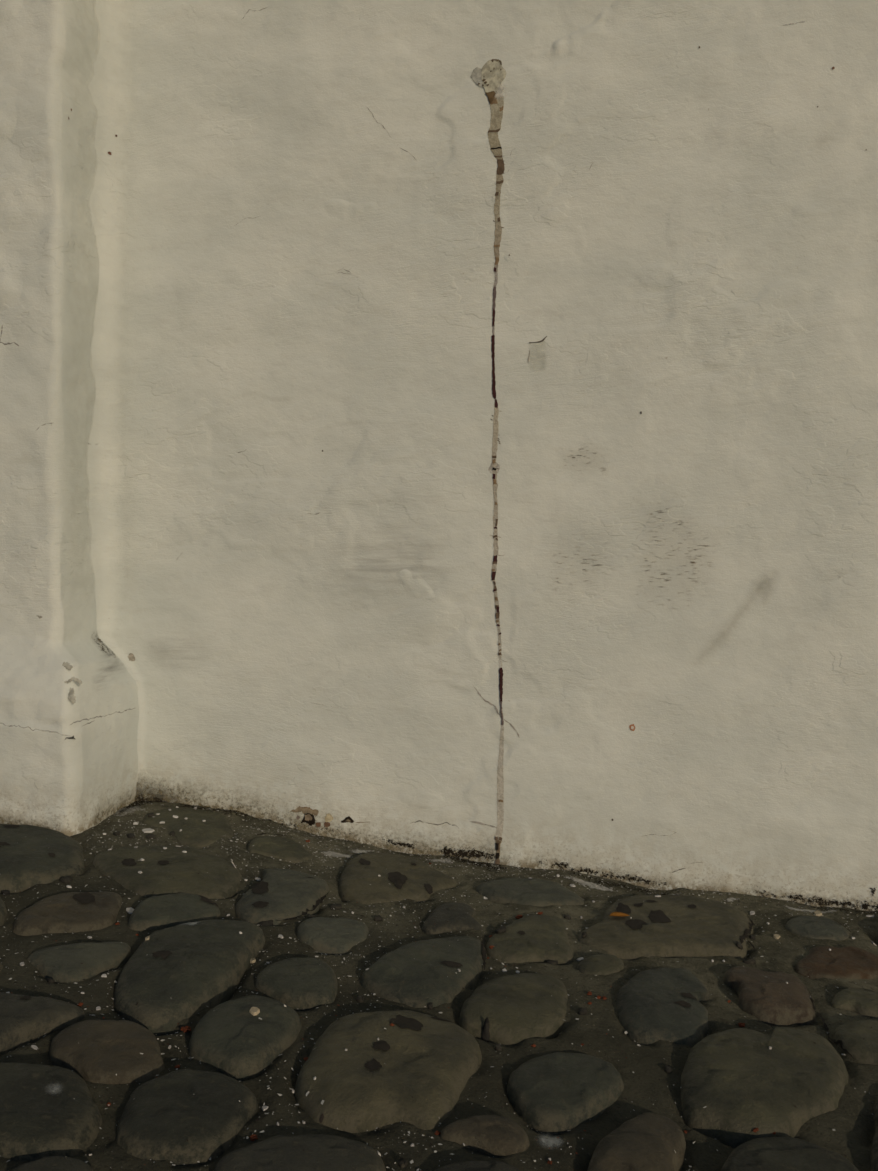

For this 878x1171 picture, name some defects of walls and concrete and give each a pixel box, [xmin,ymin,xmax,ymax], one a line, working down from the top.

crack [412,92,519,865]